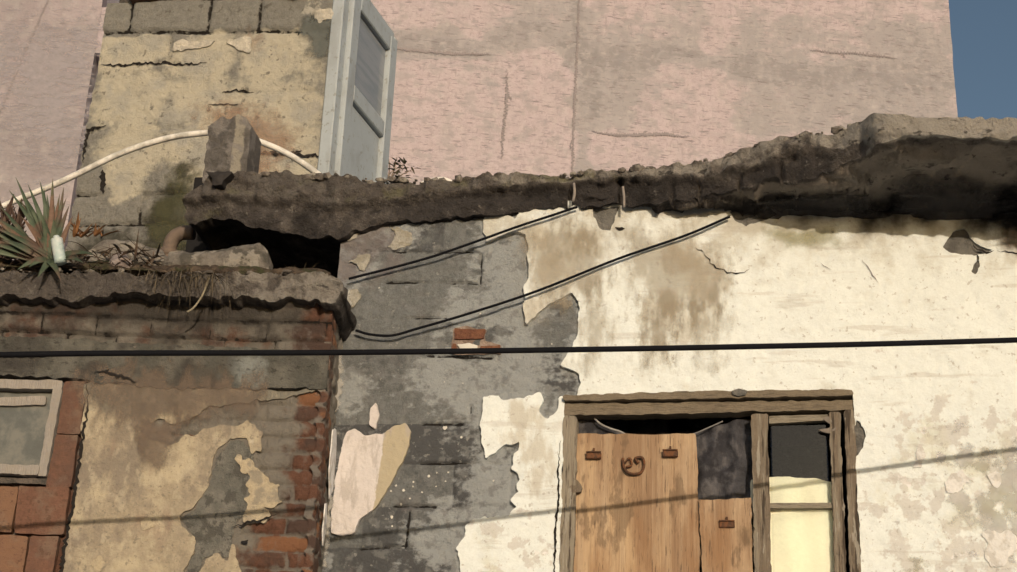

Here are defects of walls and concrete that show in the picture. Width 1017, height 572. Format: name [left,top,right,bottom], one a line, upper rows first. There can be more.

spalling [730,211,772,226]
spalling [943,229,991,274]
crack [973,245,1017,262]
peeling [153,218,581,572]